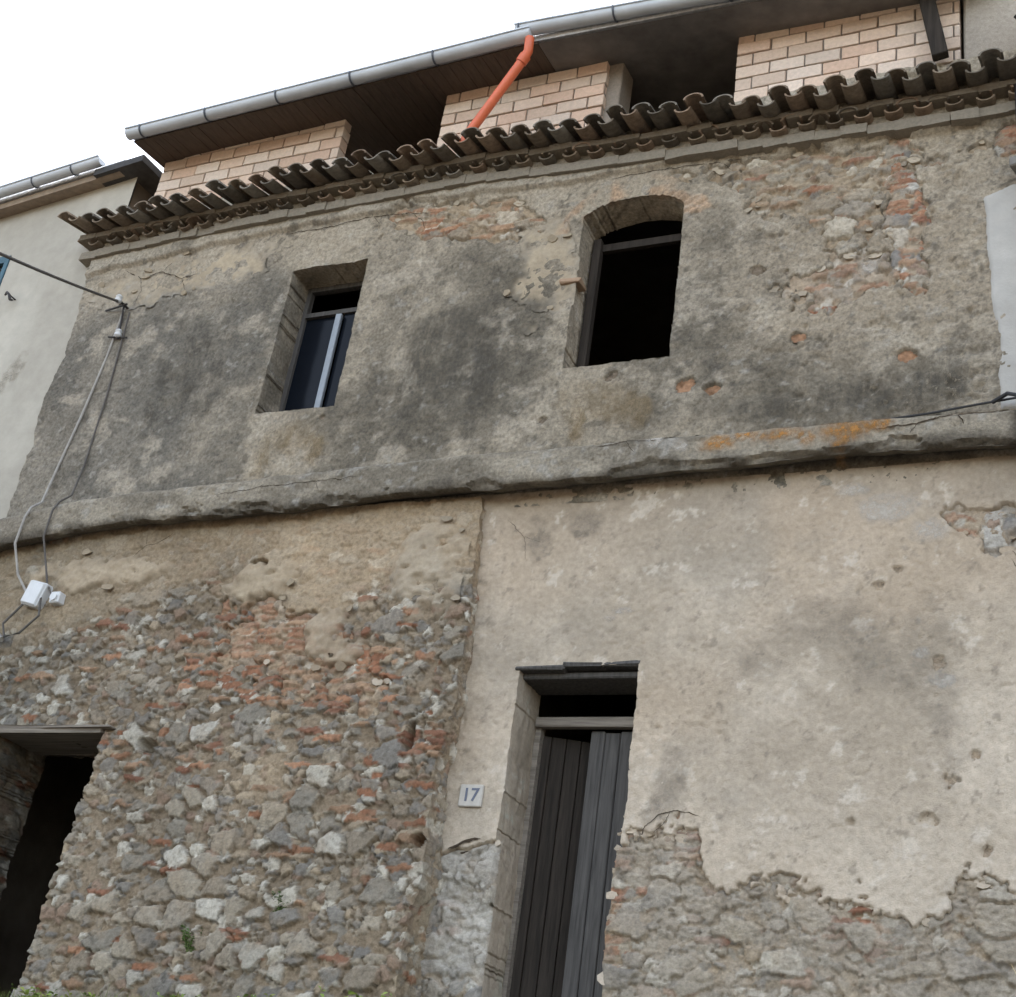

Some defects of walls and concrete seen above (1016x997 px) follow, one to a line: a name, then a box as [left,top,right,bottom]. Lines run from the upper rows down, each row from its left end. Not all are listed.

spalling [389,198,580,336]
spalling [706,137,946,316]
spalling [941,505,1016,558]
flaking render [217,578,391,719]
spalling [421,840,503,997]
spalling [597,814,1016,997]